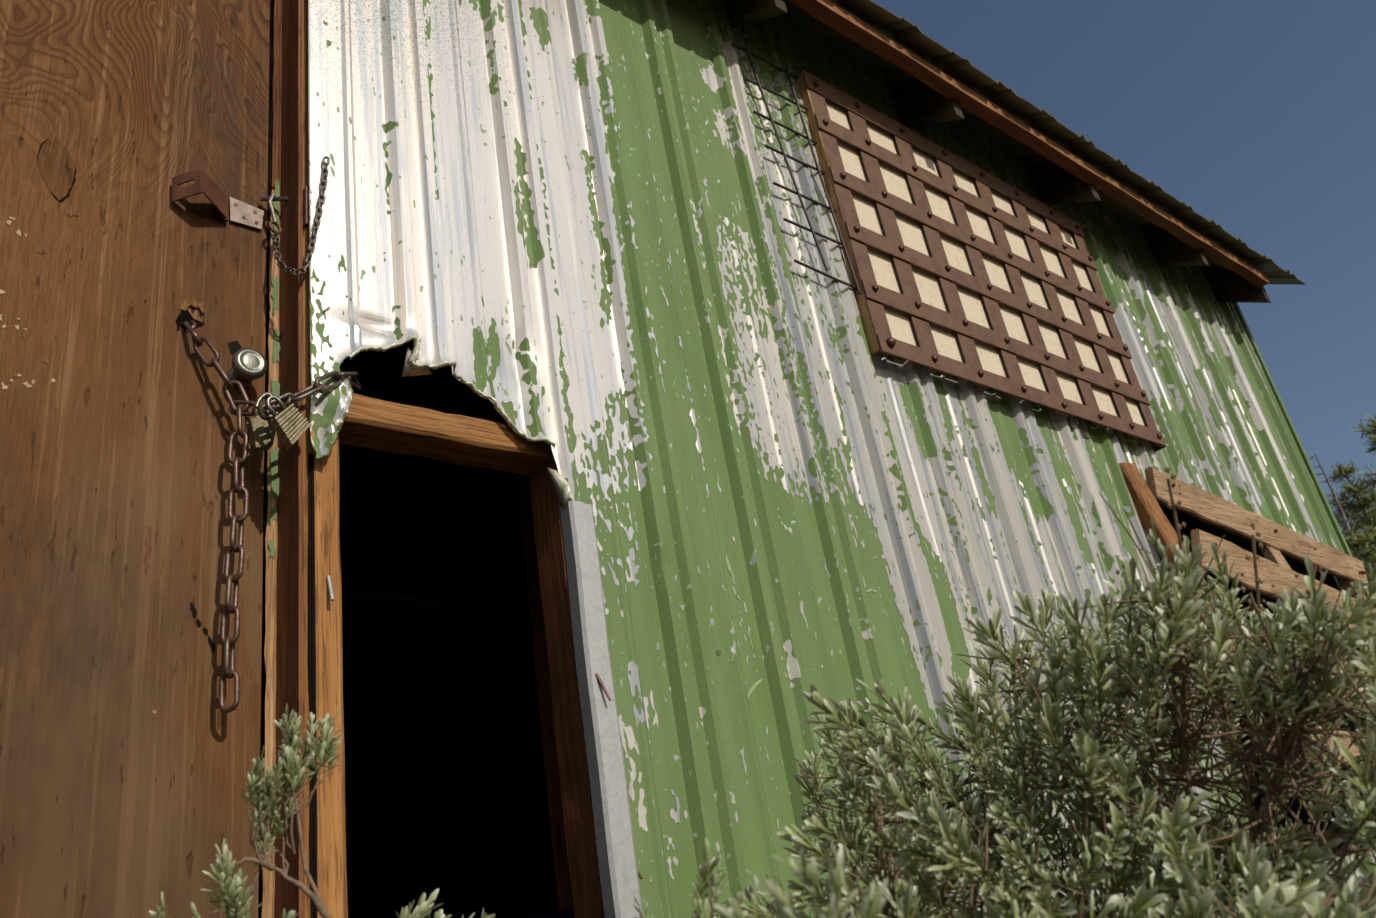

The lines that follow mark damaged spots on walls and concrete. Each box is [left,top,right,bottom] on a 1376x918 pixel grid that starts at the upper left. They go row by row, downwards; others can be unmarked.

peeling [308,0,1376,912]